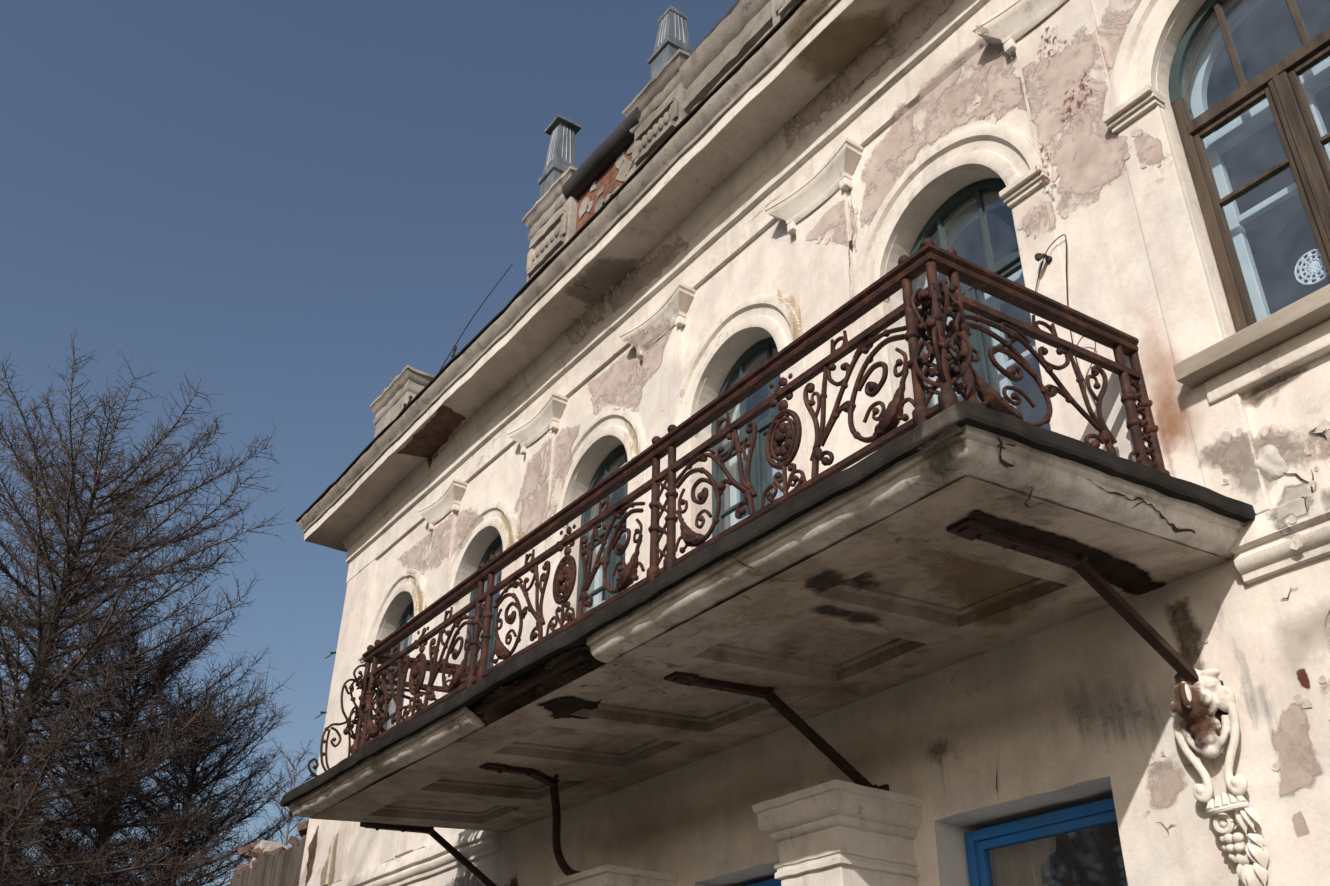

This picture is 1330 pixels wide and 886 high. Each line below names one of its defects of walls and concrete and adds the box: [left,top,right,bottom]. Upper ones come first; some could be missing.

peeling [784,0,1164,252]
peeling [565,234,689,344]
peeling [588,320,672,414]
crack [1088,479,1196,533]
spalling [1204,419,1330,550]
spalling [968,511,1166,596]
water stain [806,571,879,623]
spalling [472,645,618,729]
corrosion [1170,675,1218,747]
peeling [1271,669,1327,795]
peeling [1145,750,1195,813]
peeling [447,871,483,886]